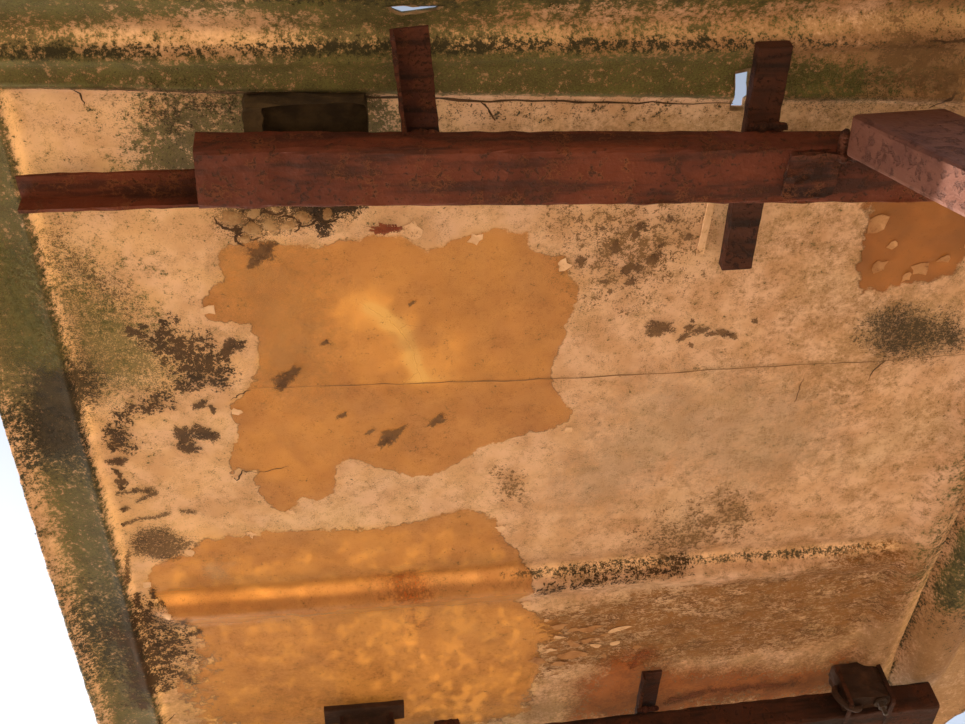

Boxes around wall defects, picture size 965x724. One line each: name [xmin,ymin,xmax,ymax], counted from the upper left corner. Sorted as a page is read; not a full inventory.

crack [930,37,965,45]
crack [11,88,258,104]
crack [435,97,733,121]
peeling [400,220,423,240]
peeling [855,201,965,295]
peeling [199,242,305,515]
peeling [509,250,579,439]
crack [231,354,964,402]
leakage [852,299,965,367]
leakage [8,218,248,712]
peeling [143,531,257,620]
leakage [532,484,777,597]